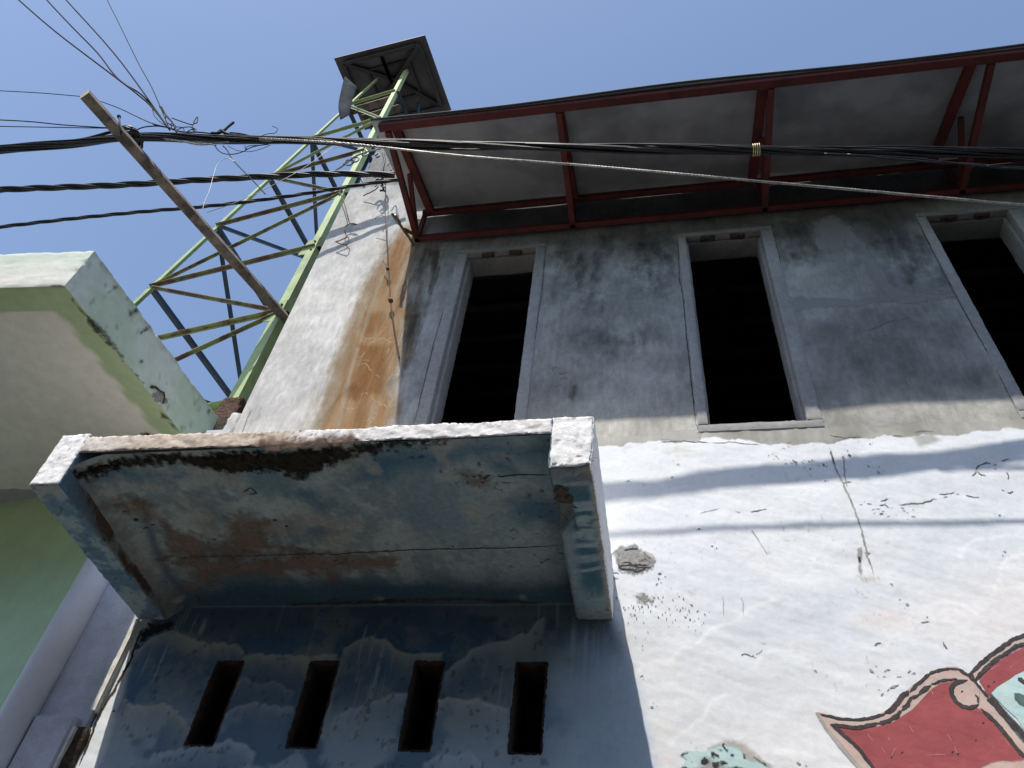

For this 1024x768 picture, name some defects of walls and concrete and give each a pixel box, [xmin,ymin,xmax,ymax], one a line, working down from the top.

corrosion [317,227,415,430]
spalling [151,385,169,404]
leakage [72,439,446,481]
crack [830,435,873,572]
crack [166,545,559,558]
spalling [612,544,706,650]
leakage [135,621,173,649]